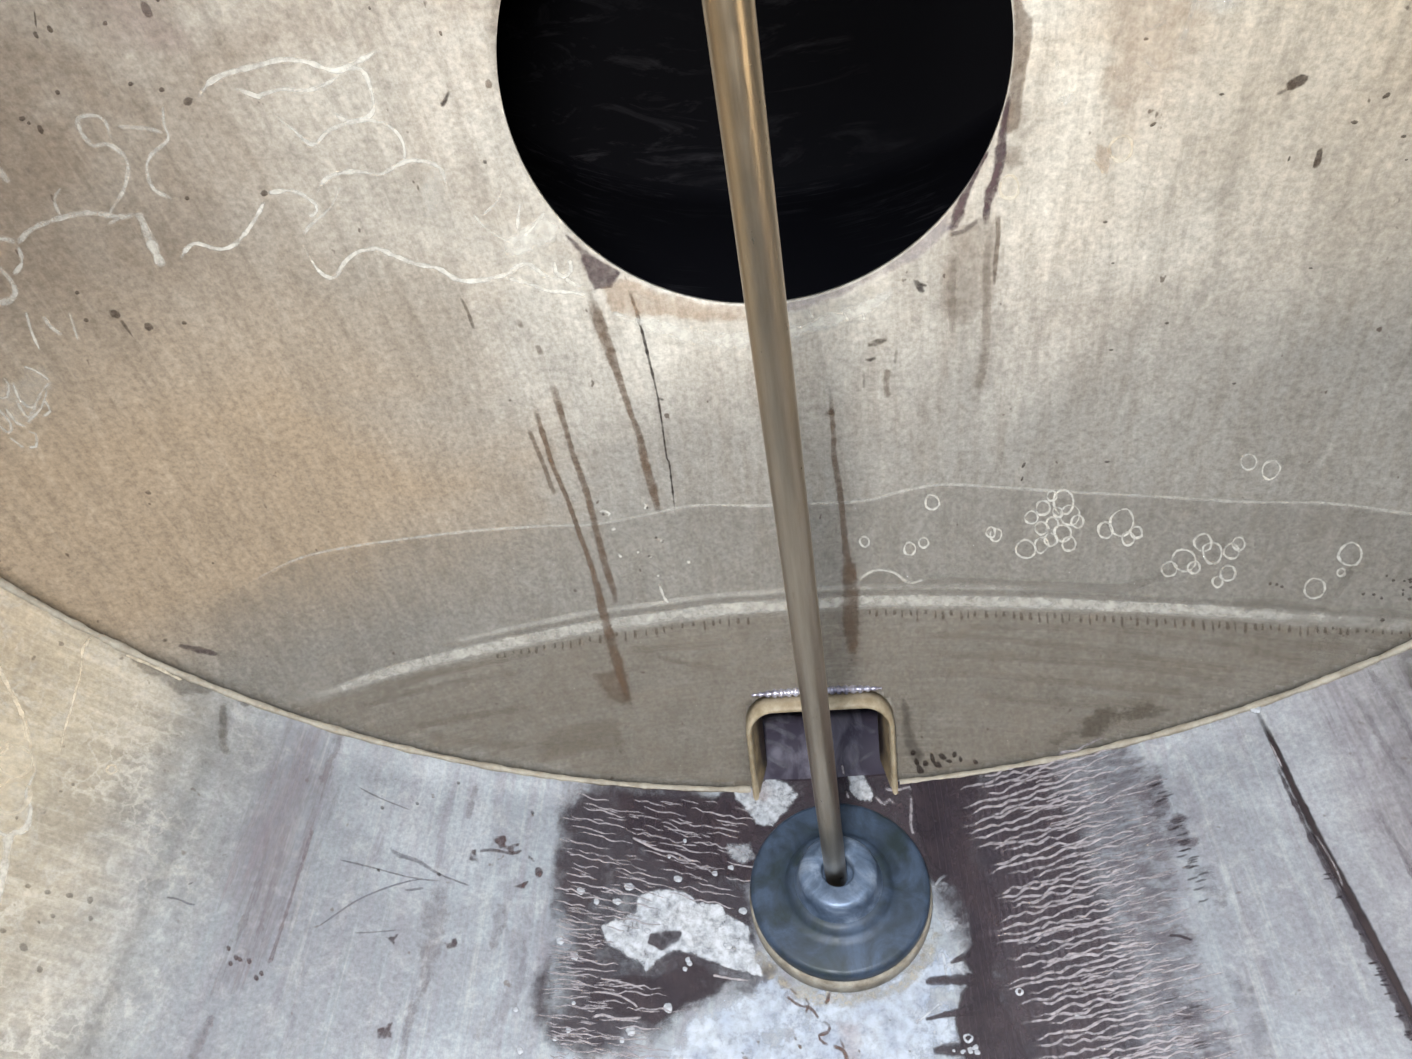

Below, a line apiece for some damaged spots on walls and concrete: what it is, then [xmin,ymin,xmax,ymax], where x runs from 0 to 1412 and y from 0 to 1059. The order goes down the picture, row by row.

rust [530,393,628,697]
rust [830,410,858,651]
leakage [535,738,1250,1059]